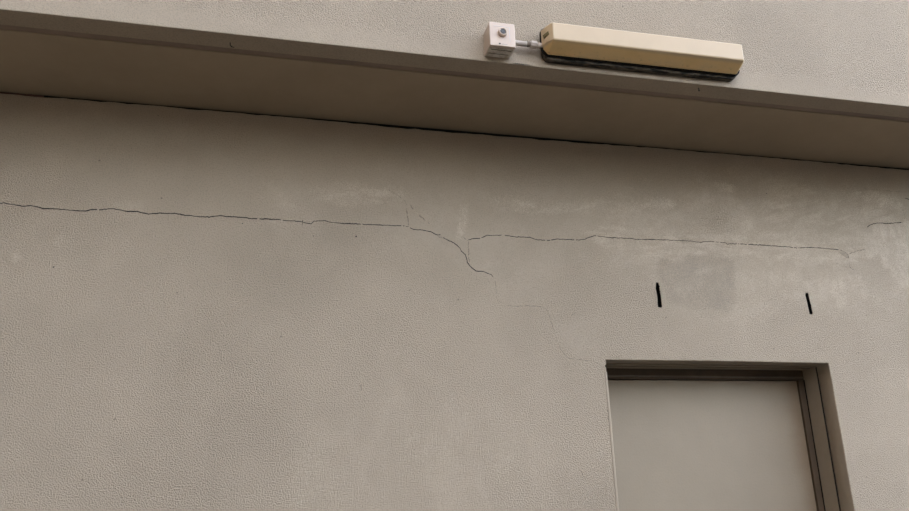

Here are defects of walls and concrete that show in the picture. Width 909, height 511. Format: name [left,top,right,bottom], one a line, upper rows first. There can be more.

crack [0,202,851,275]